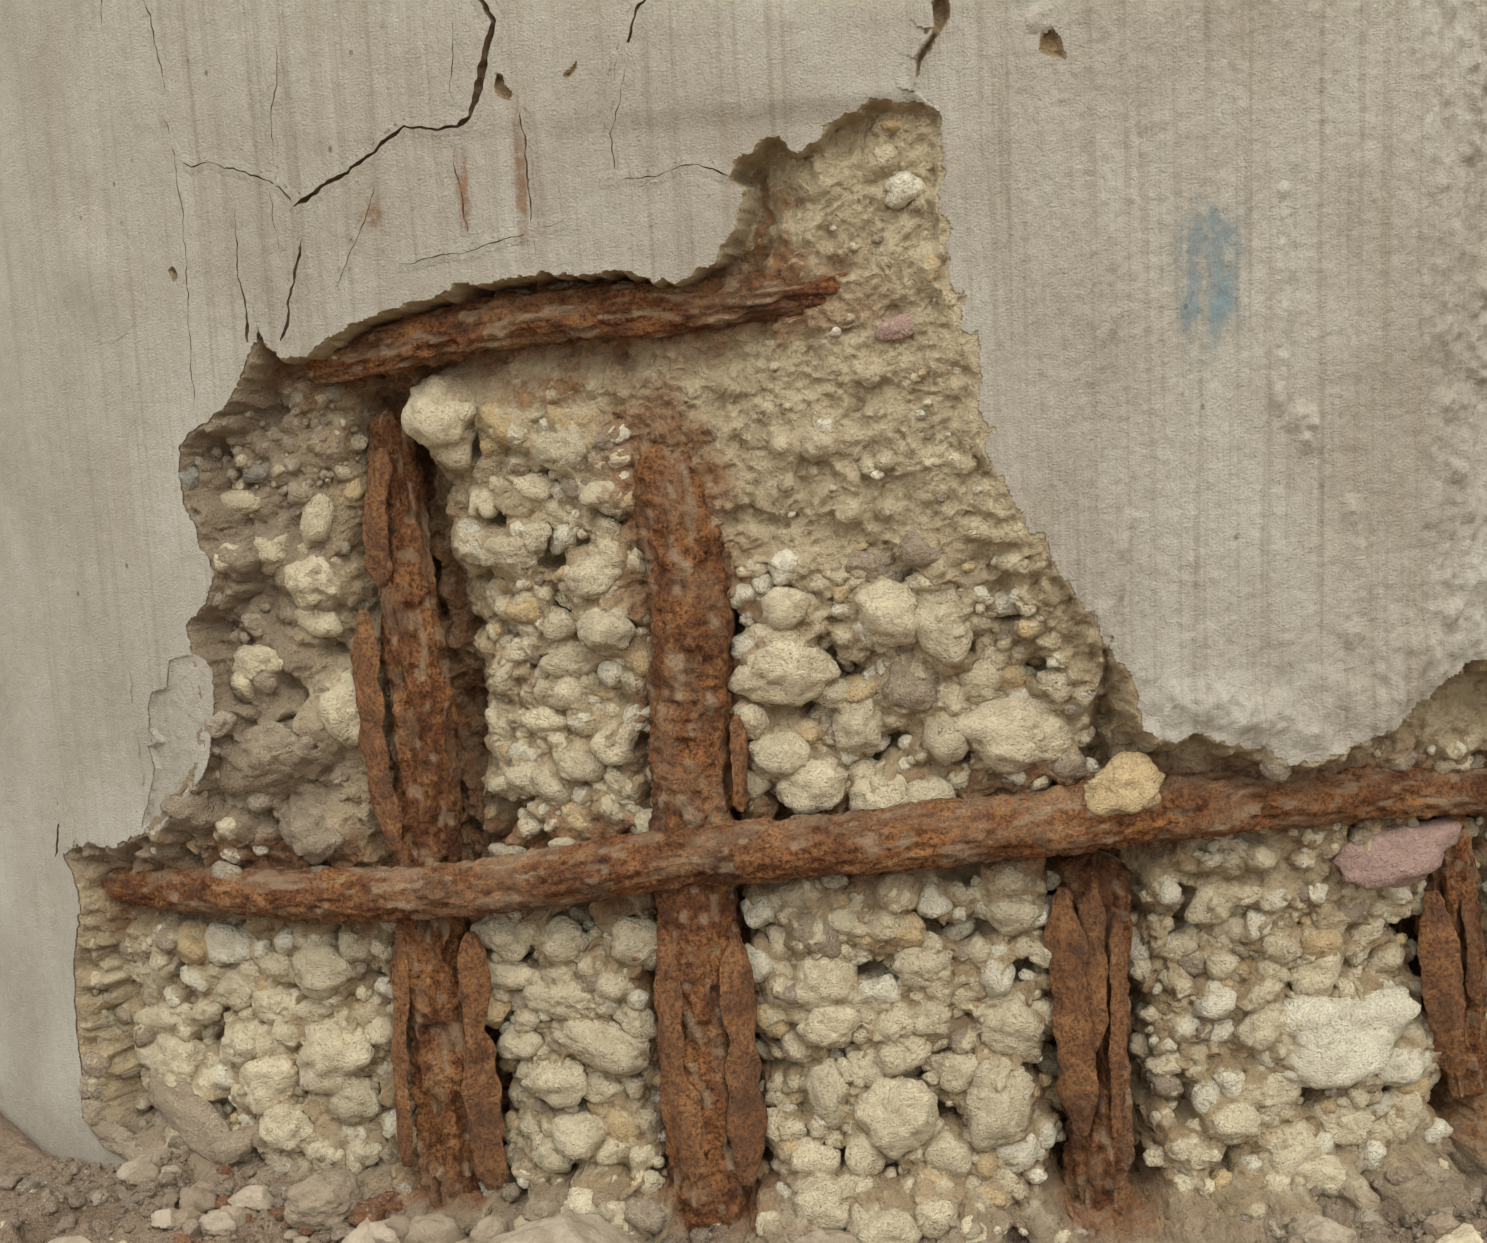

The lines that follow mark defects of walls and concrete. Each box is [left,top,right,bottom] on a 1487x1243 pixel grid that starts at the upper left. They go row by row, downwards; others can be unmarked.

spalling [494,73,512,100]
crack [599,0,734,191]
peeling [892,0,950,108]
spalling [1038,29,1067,59]
crack [95,0,569,414]
corrosion [304,271,849,391]
corrosion [101,409,1487,1234]
spalling [146,1007,306,1115]
spalling [158,1061,315,1185]
spalling [246,1000,264,1032]
spalling [330,891,688,1243]
spalling [719,812,1487,1243]